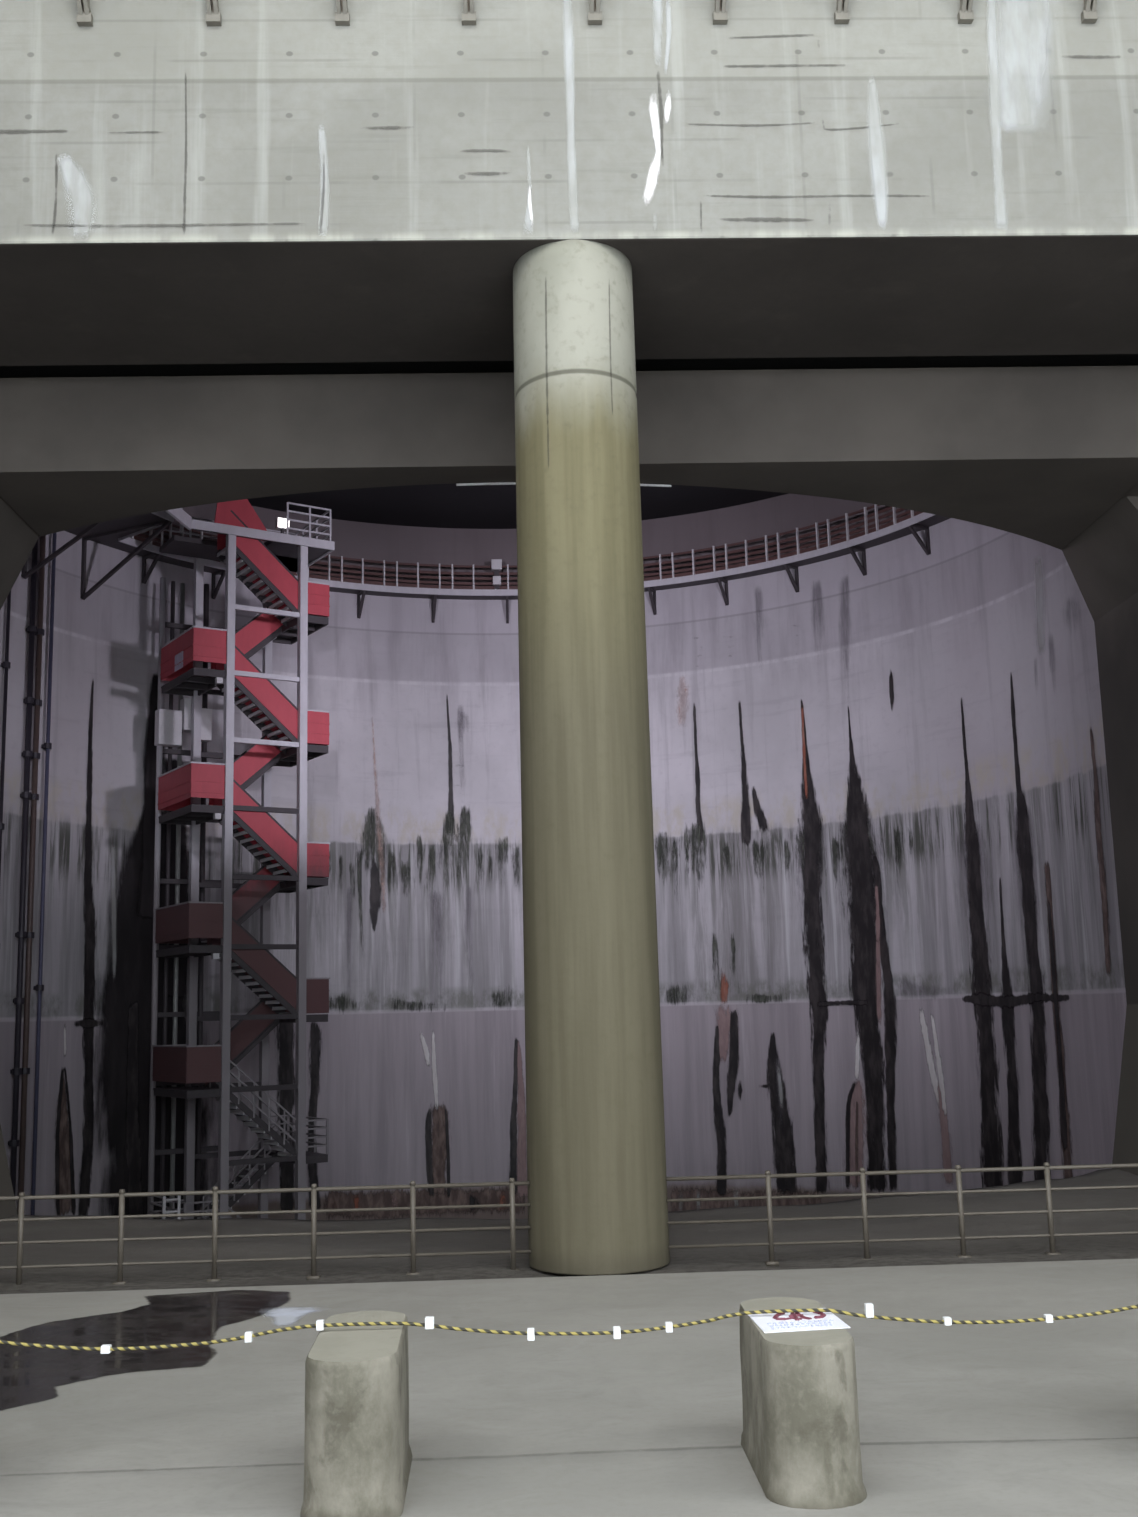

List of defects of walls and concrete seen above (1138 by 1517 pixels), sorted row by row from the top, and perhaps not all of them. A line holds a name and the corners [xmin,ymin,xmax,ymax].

water stain [989,0,1042,222]
water stain [75,674,216,1219]
water stain [671,700,897,1211]
water stain [961,674,1073,1188]